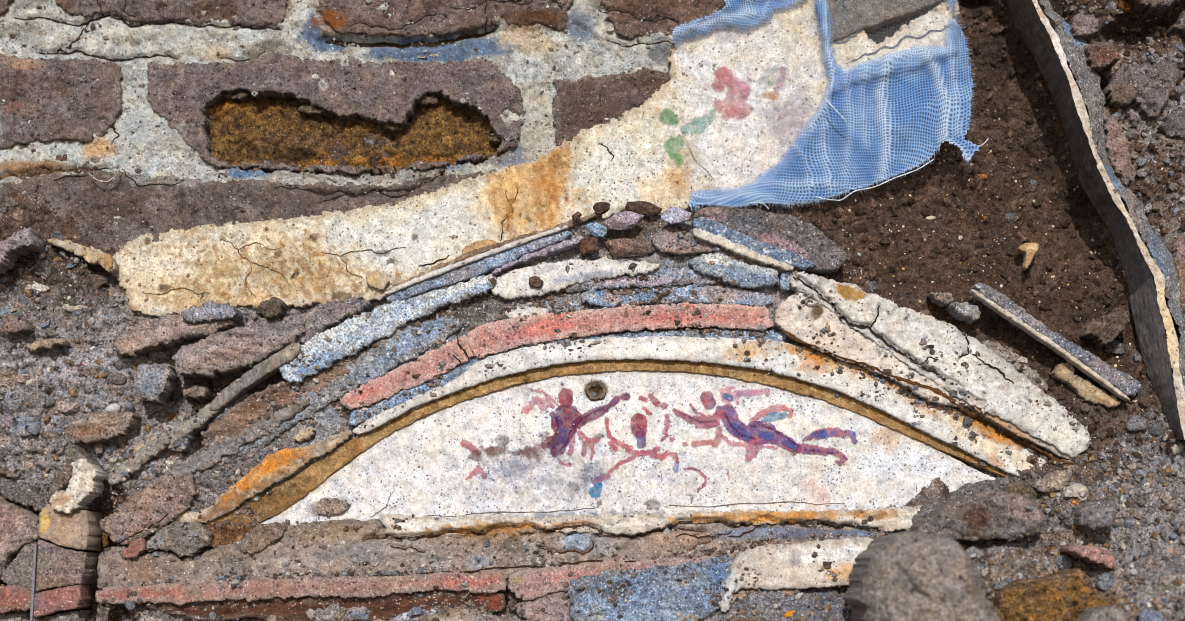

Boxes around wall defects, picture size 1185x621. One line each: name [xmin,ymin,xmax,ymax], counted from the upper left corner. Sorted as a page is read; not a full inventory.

peeling [1108,25,1185,86]
spalling [206,91,502,175]
peeling [8,238,119,381]
crack [142,287,208,295]
crack [219,236,289,297]
peeling [2,362,83,426]
peeling [141,372,245,435]
crack [782,276,1074,465]
peeling [153,452,182,478]
peeling [121,538,149,559]
peeling [1100,483,1185,612]